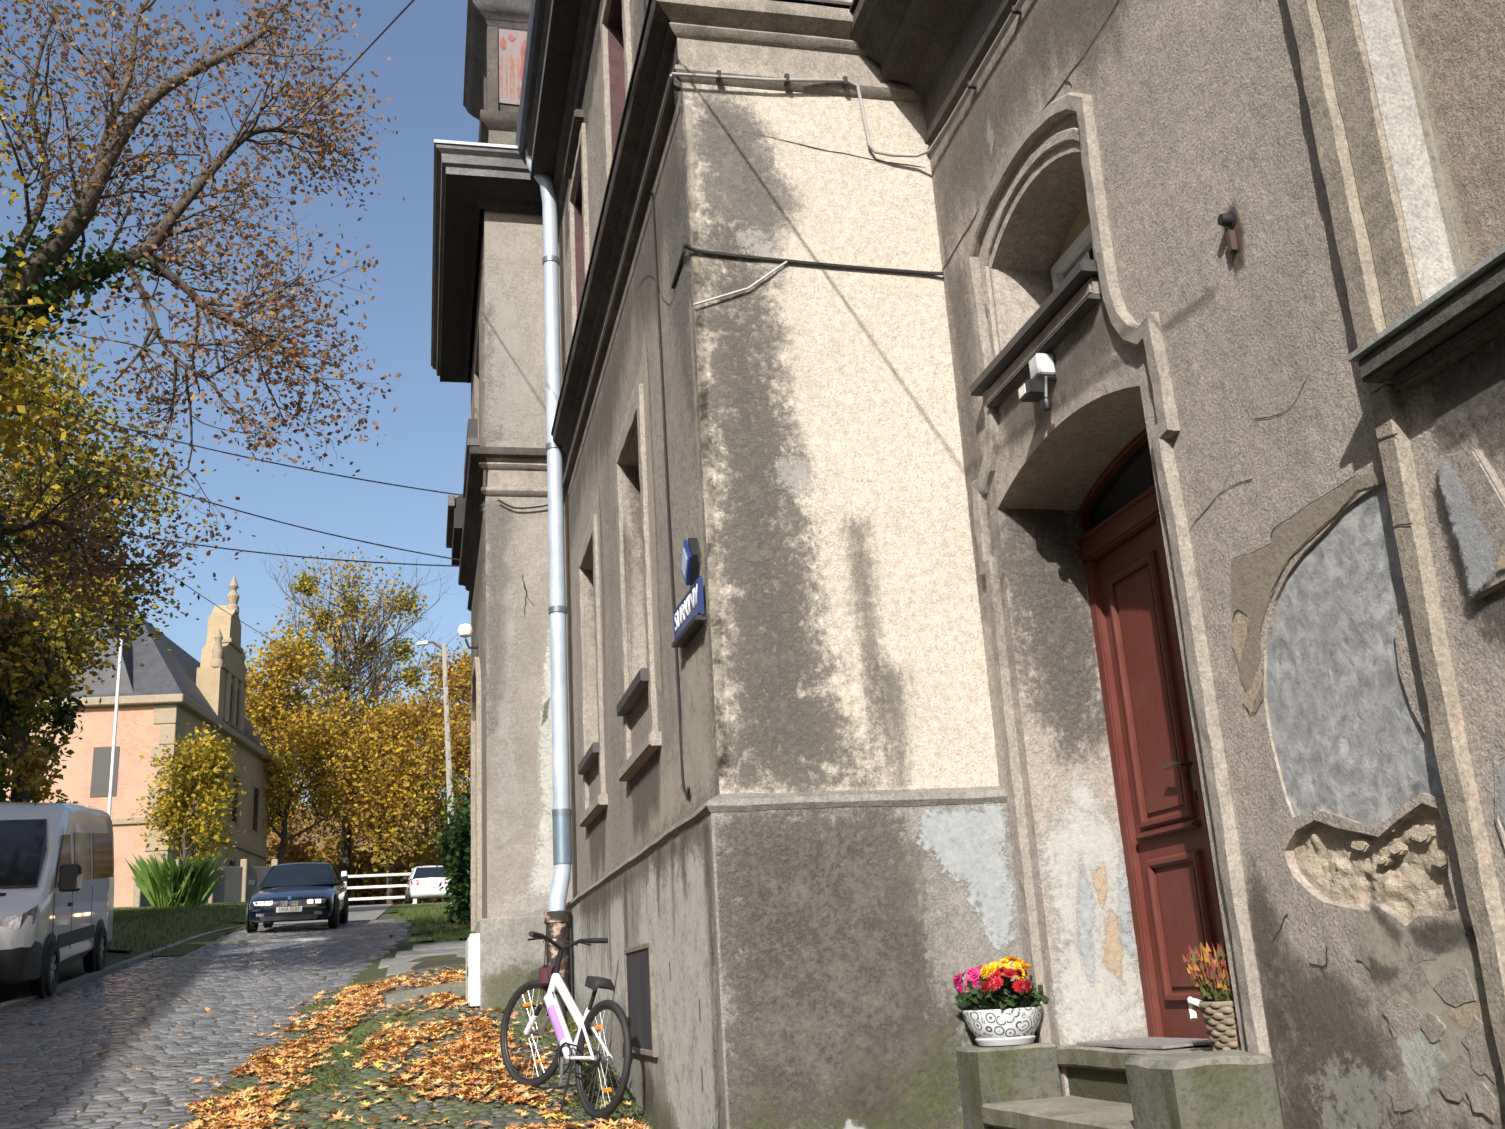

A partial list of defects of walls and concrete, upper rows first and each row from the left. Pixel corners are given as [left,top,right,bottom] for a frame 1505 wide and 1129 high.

damp [634,0,648,51]
damp [568,80,963,1129]
flaking render [1039,777,1146,1045]
flaking render [1231,472,1505,1126]